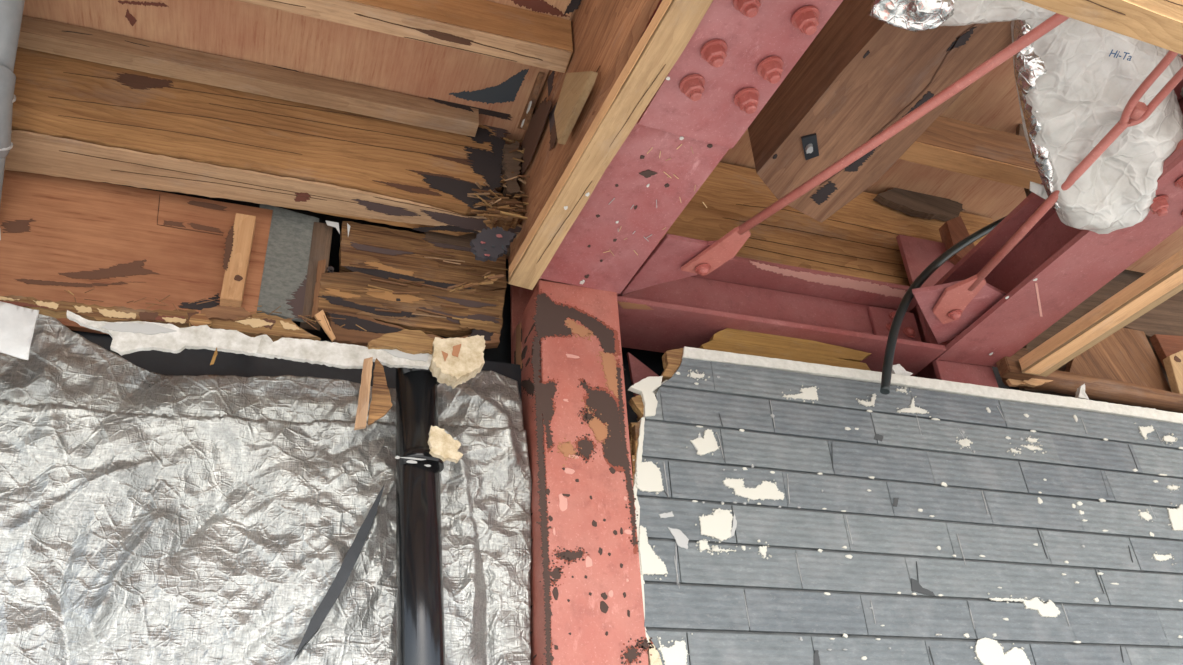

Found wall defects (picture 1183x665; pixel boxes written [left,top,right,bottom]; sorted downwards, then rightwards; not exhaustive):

leakage [350,69,557,262]
leakage [15,259,159,288]
leakage [286,266,502,341]
spalling [782,385,819,404]
spalling [686,429,720,456]
rust [514,293,639,665]
spalling [628,348,710,665]
spalling [695,478,784,559]
spalling [1166,485,1183,531]
spalling [988,593,1060,618]
rust [621,637,657,665]
spalling [970,637,1031,665]